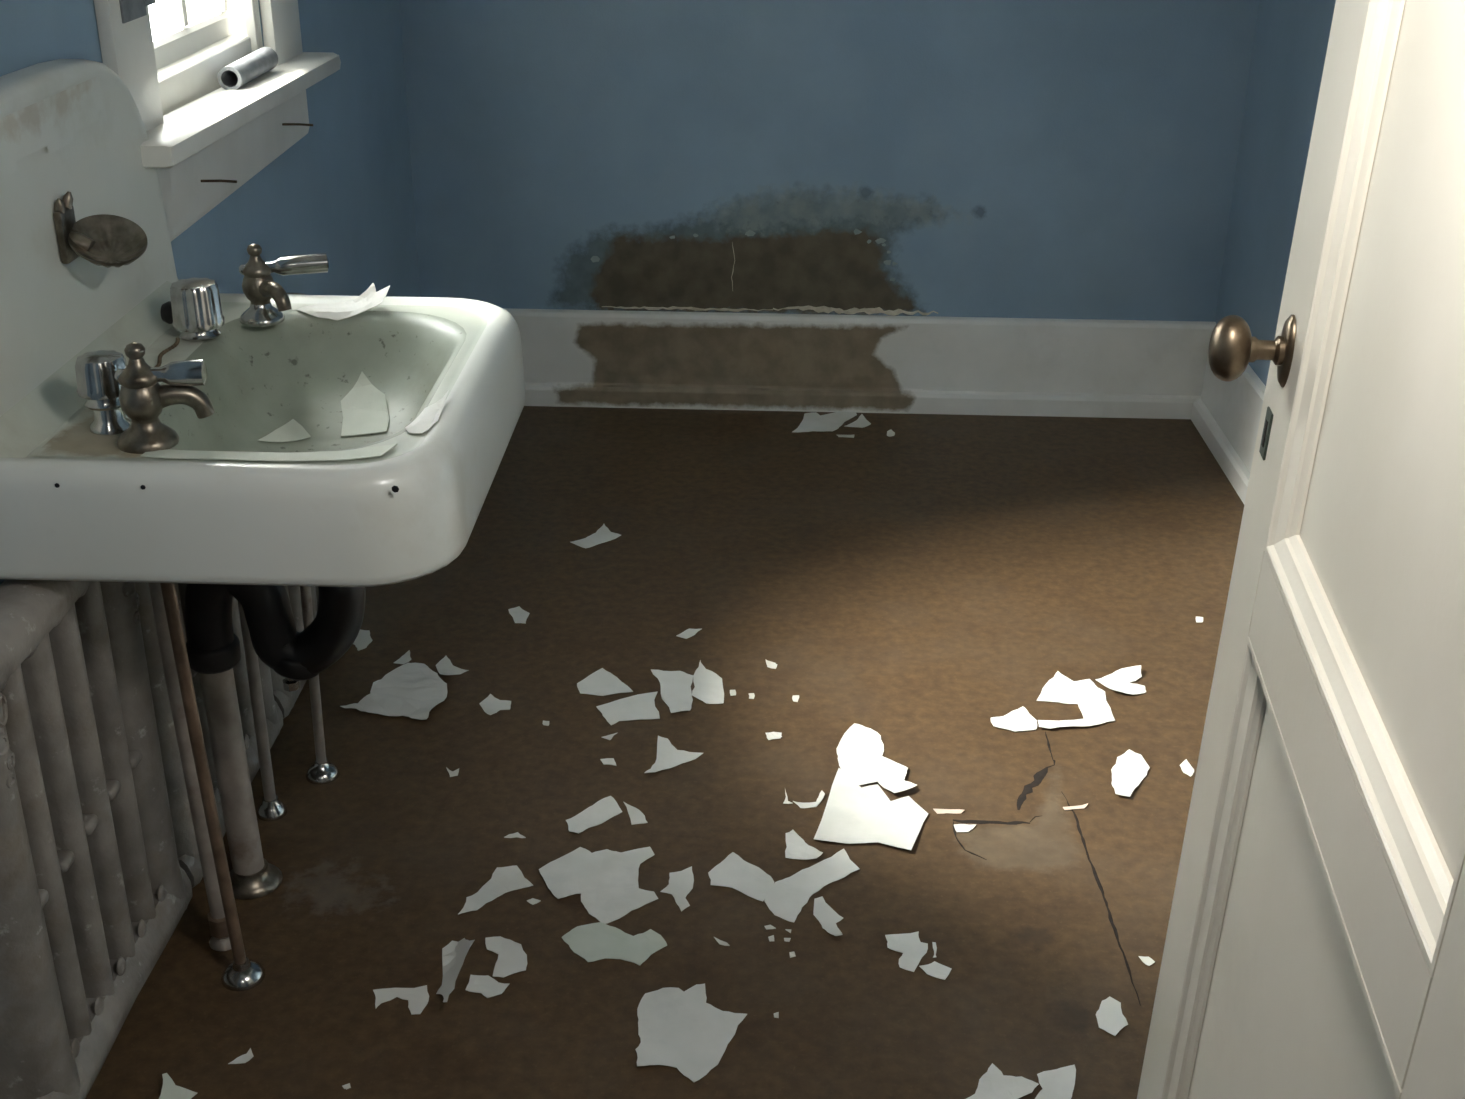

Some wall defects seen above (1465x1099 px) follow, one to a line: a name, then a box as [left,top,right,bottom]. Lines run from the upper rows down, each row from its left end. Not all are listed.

peeling [527,167,987,438]
crack [933,732,1141,1006]